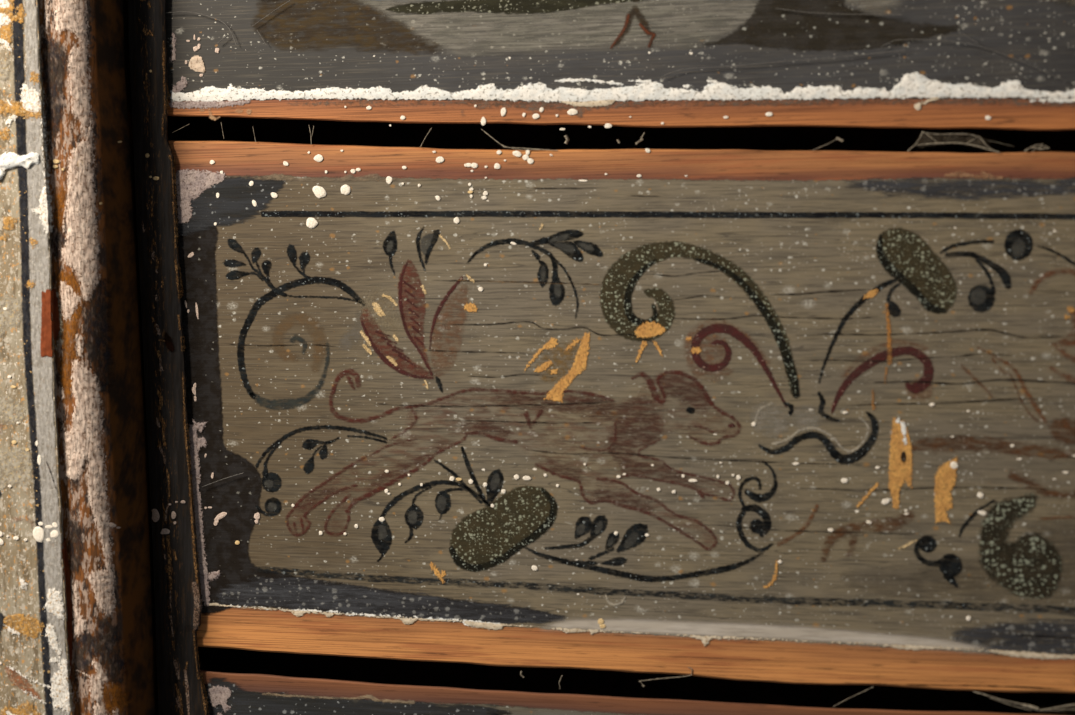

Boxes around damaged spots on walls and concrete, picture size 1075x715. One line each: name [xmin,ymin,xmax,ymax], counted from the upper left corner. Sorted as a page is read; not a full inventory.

leakage [555,78,652,86]
leakage [680,84,1075,106]
leakage [443,99,664,117]
peeling [0,0,129,715]